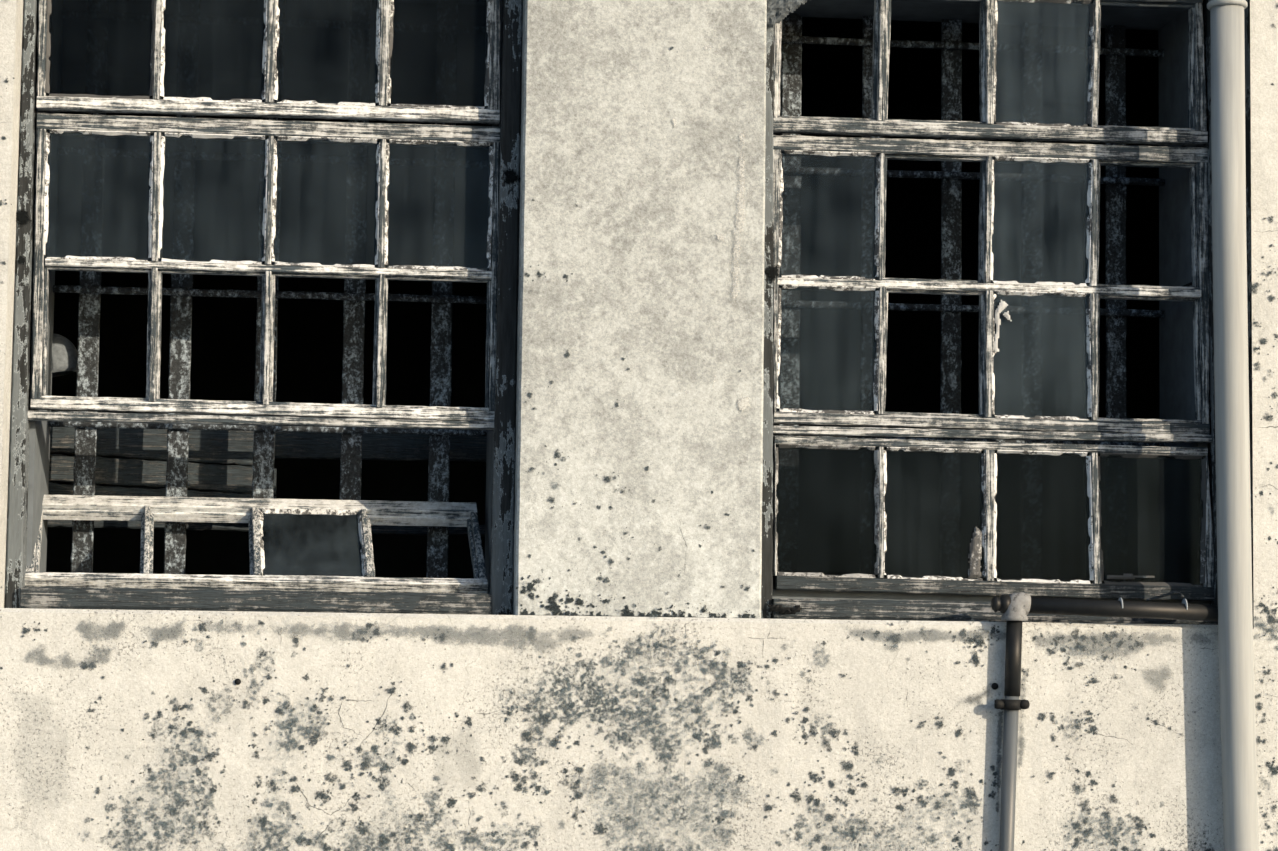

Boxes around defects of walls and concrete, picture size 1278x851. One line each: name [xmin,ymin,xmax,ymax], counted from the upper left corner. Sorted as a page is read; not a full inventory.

damp [525,537,631,612]
damp [1019,621,1213,851]